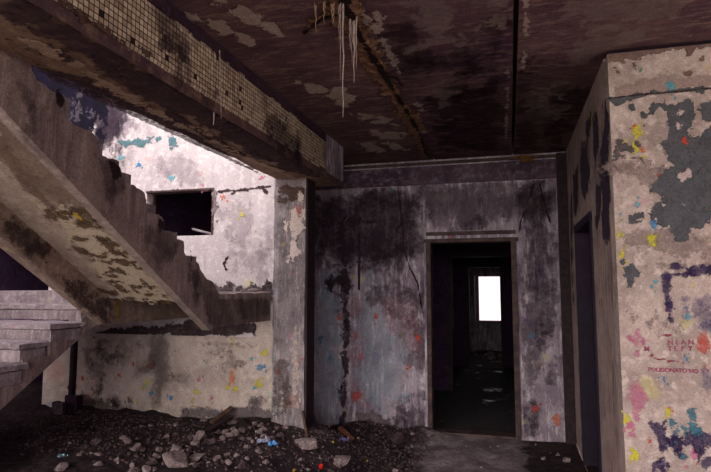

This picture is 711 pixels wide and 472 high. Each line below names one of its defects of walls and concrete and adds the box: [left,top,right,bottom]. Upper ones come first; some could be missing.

peeling [0,121,177,305]
spalling [0,0,320,263]
crack [149,185,271,194]
crack [336,214,352,424]
crack [302,0,431,159]
corrosion [304,0,430,155]
leakage [315,184,558,372]
peeling [573,86,711,245]
crack [607,87,711,99]